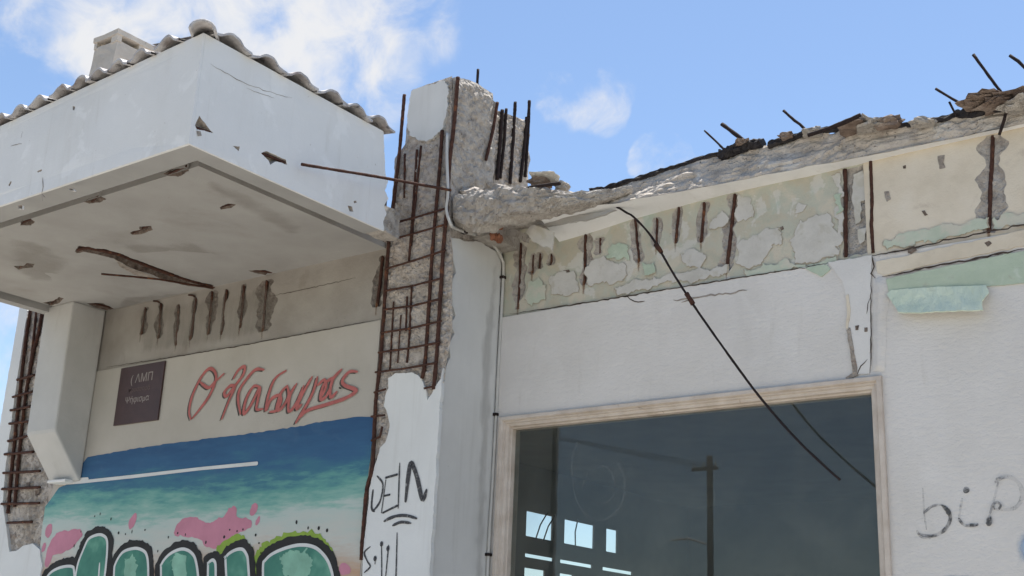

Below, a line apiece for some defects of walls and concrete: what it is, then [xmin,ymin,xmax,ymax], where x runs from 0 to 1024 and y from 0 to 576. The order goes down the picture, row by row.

spalling [195,116,213,136]
crack [211,64,291,98]
spalling [261,151,287,165]
spalling [75,246,215,289]
corrosion [370,255,386,308]
spalling [359,69,561,560]
spalling [524,112,1024,379]
corrosion [842,161,875,258]
crack [857,224,1024,374]
spalling [0,297,64,549]